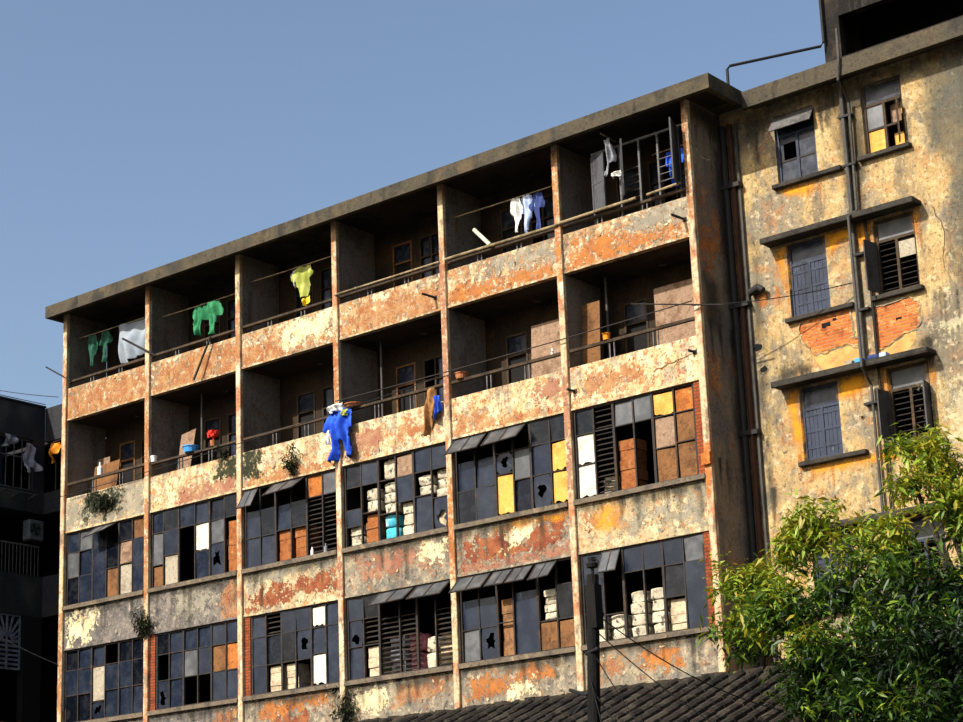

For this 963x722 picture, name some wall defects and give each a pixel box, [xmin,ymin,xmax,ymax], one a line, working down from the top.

spalling [797,294,923,370]
corrosion [502,514,561,529]